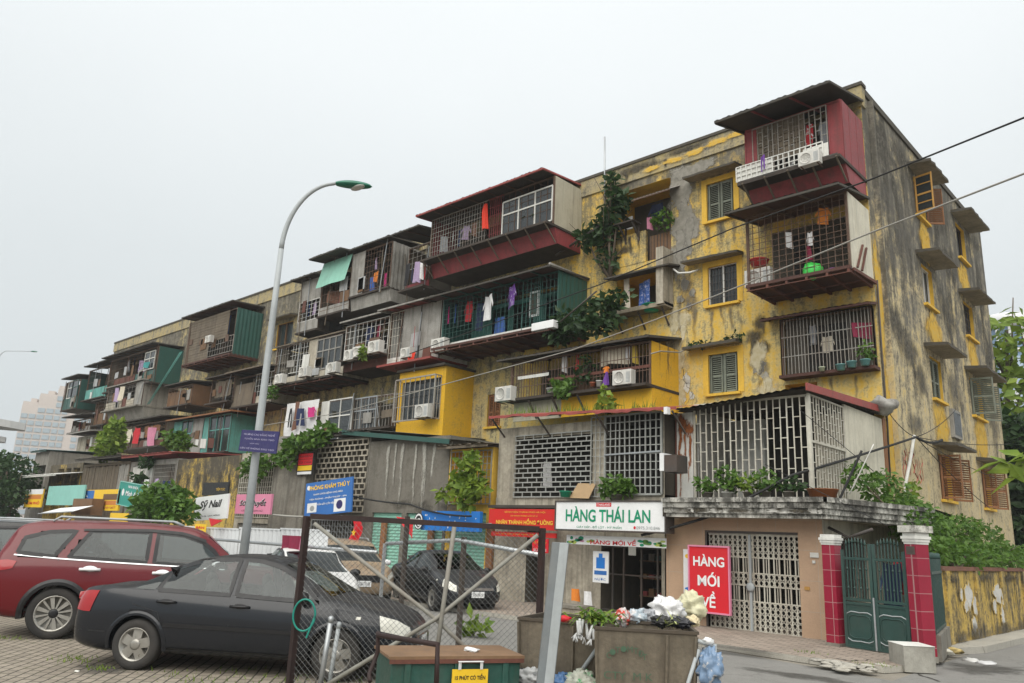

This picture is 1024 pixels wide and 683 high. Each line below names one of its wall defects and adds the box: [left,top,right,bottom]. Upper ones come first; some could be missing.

water stain [876,122,908,278]
peeling [645,132,741,413]
peeling [750,340,777,394]
water stain [890,307,927,393]
water stain [944,301,956,346]
water stain [385,443,436,511]
rust [678,414,693,497]
peeling [959,581,978,631]
peeling [992,583,1005,625]